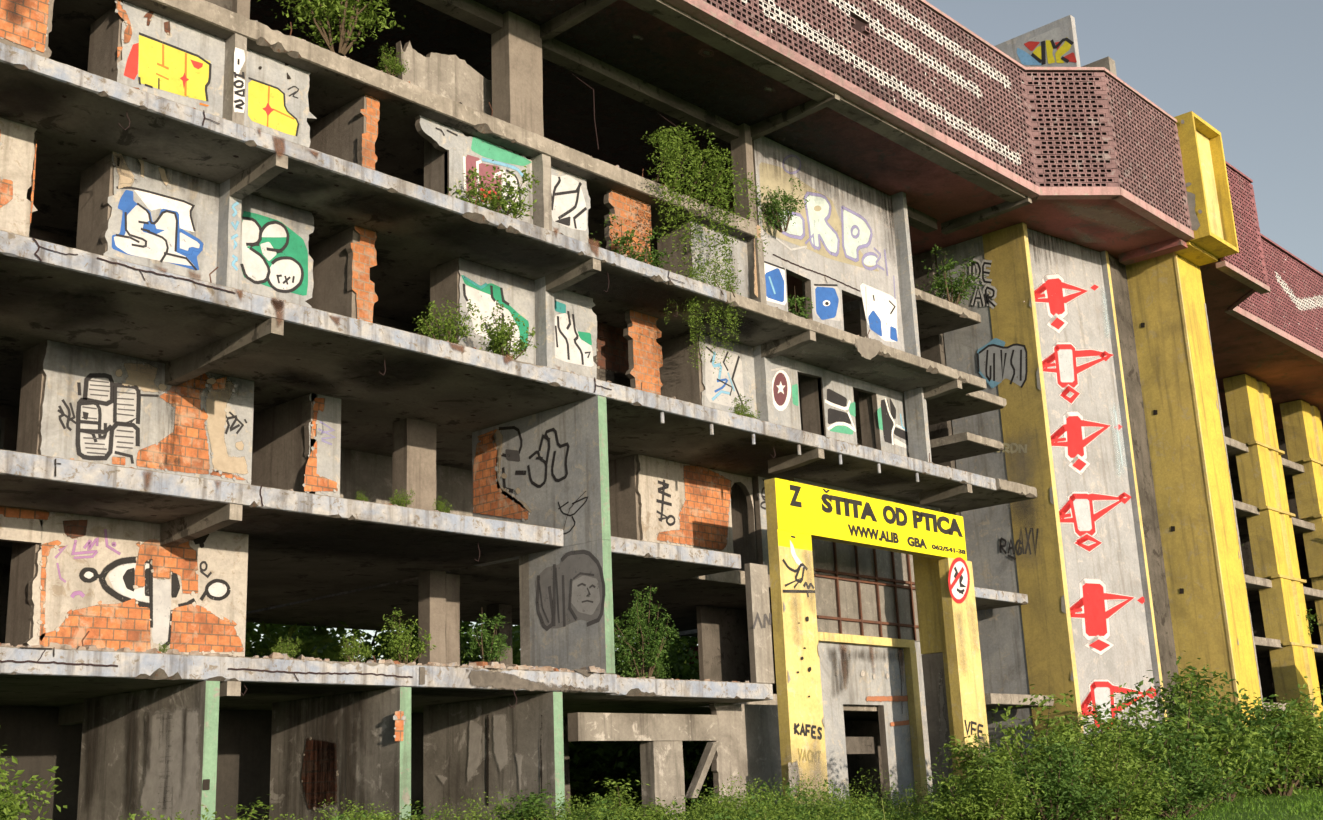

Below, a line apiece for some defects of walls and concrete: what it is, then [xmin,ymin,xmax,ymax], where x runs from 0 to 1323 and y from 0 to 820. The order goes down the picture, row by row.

flaking render [0,0,50,52]
flaking render [0,177,13,207]
flaking render [112,363,251,483]
flaking render [302,397,339,493]
flaking render [473,428,531,521]
flaking render [657,465,732,550]
spalling [0,487,523,654]
spalling [241,685,364,695]
peeling [393,710,406,741]
spalling [411,667,609,697]